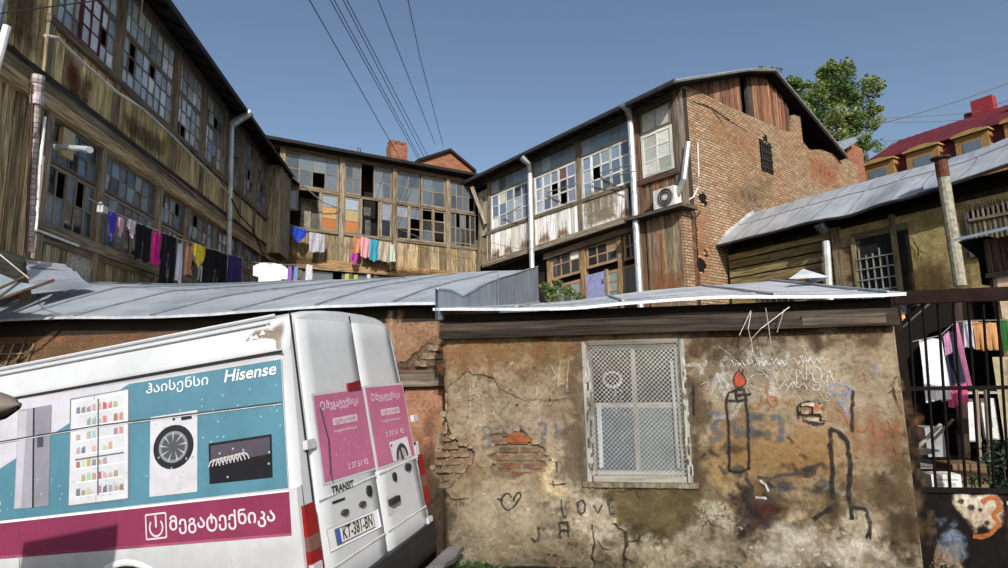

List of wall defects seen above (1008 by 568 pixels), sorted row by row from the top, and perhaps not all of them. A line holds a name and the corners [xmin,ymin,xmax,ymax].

crack [693,101,743,129]
spalling [398,339,444,367]
crack [443,371,573,401]
spalling [797,401,828,425]
spalling [429,411,473,489]
spalling [490,427,567,496]
rust [940,545,962,568]